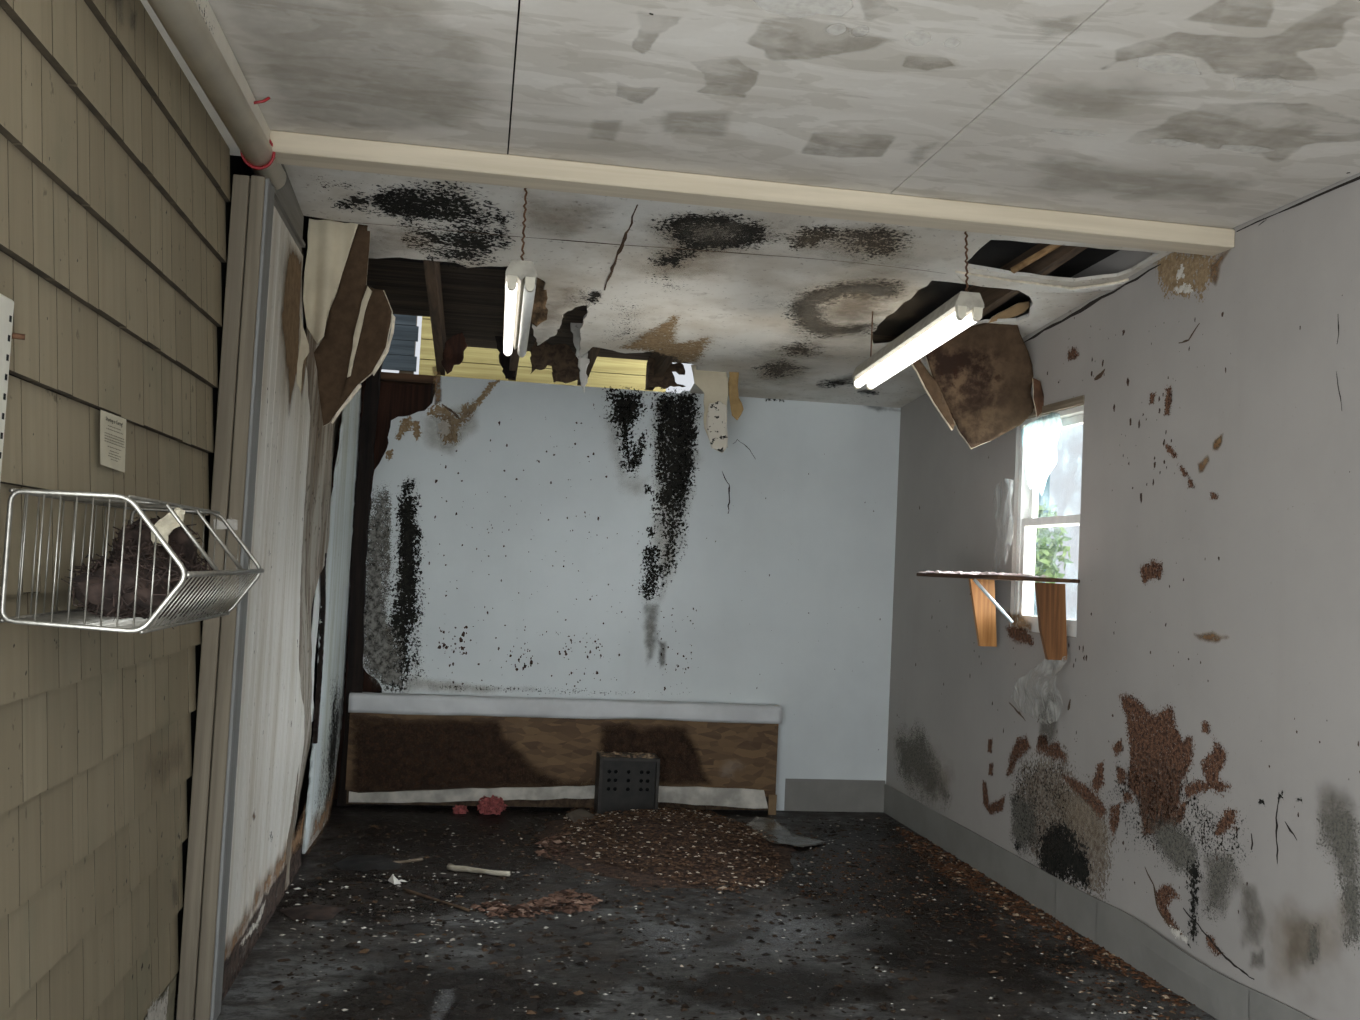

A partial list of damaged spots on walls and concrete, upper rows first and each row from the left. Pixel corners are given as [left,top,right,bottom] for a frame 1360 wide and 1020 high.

leakage [316,176,518,269]
spalling [1150,252,1227,304]
spalling [386,367,500,461]
leakage [349,477,429,693]
leakage [602,385,702,665]
leakage [602,724,707,784]
leakage [221,675,578,1003]
spalling [982,693,1254,980]
leakage [1316,795,1360,955]